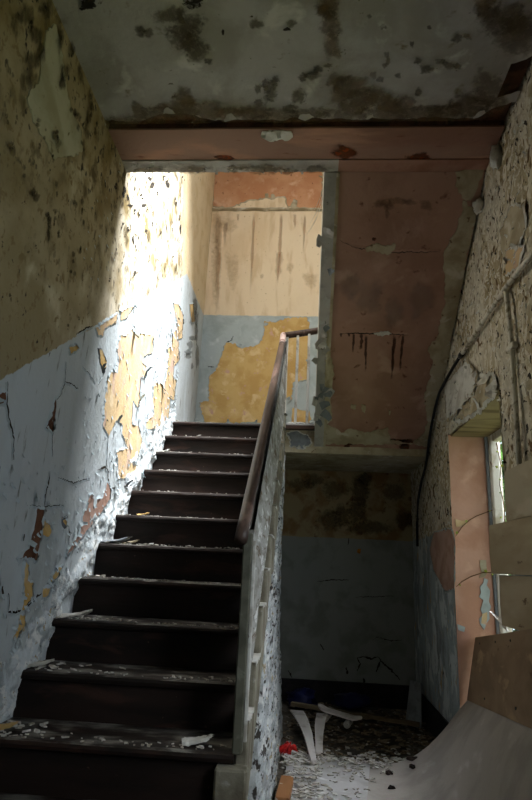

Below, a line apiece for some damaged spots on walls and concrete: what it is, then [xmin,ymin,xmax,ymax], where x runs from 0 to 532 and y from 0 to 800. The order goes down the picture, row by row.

damp [17,0,53,87]
peeling [26,23,83,159]
damp [70,0,505,134]
flaking render [261,130,293,142]
damp [115,167,170,234]
crack [5,382,15,461]
crack [29,434,116,510]
crack [56,361,103,399]
flaking render [0,300,196,723]
peeling [199,316,335,450]
flaking render [429,334,528,594]
peeling [479,560,491,629]